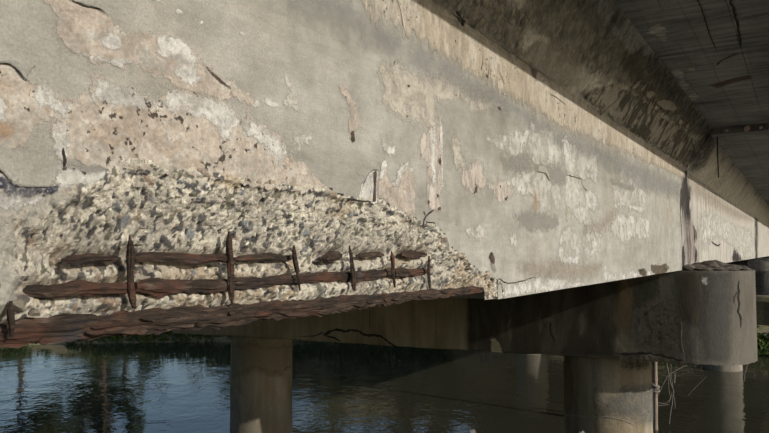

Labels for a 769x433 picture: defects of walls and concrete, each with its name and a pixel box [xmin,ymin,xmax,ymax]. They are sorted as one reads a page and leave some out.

crack [697,0,742,66]
peeling [362,0,694,265]
spalling [0,0,585,348]
damp [437,0,732,361]
peeling [602,263,669,282]
crack [734,281,742,325]
crack [294,328,403,349]